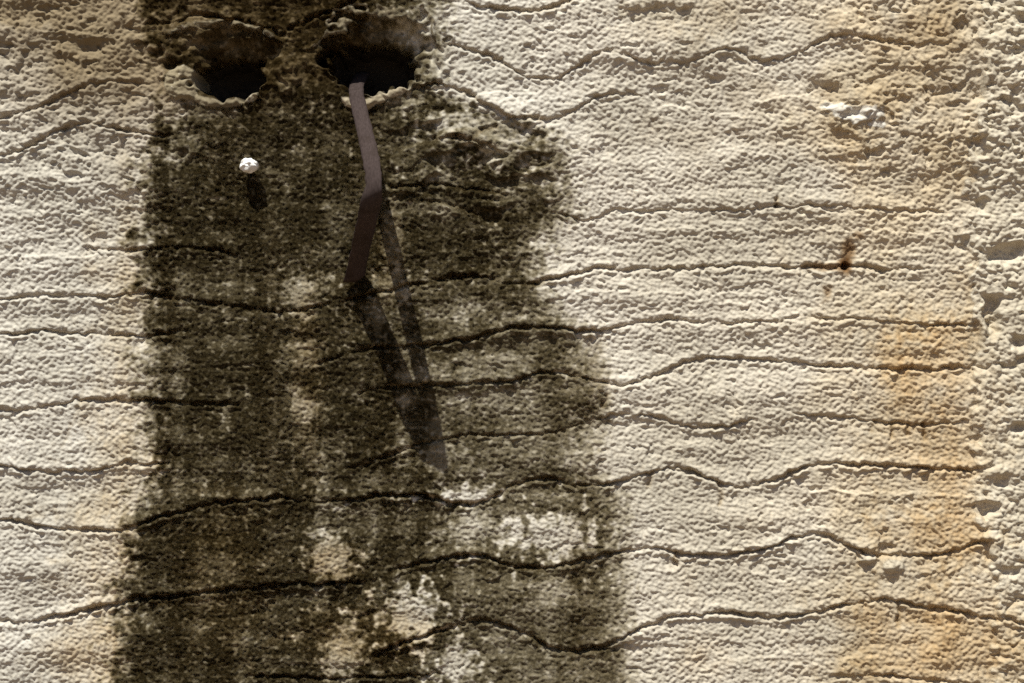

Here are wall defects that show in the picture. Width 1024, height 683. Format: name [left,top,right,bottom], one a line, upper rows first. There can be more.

spalling [171,19,273,37]
spalling [314,3,453,46]
spalling [164,63,267,108]
spalling [321,50,415,109]
corrosion [840,245,851,272]
damp [104,0,624,683]